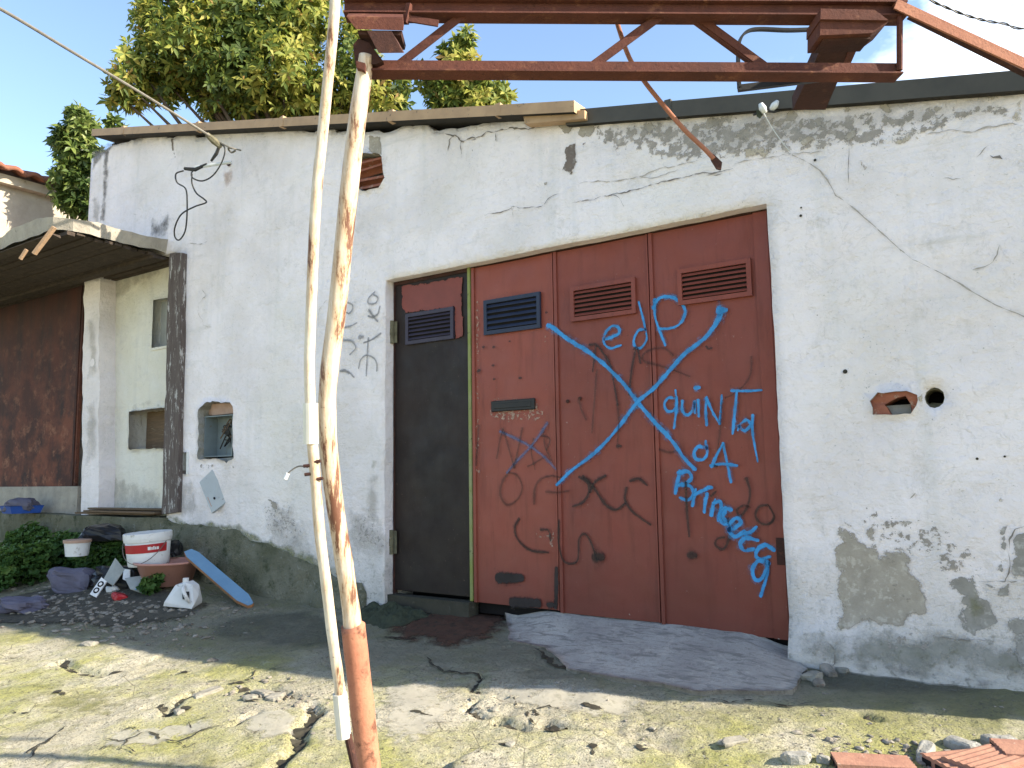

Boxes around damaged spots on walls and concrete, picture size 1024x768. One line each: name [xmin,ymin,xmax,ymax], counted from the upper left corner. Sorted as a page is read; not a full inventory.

crack [437,127,535,154]
peeling [559,95,1021,175]
crack [928,123,1023,159]
crack [486,151,1024,317]
flaking render [835,508,1024,667]